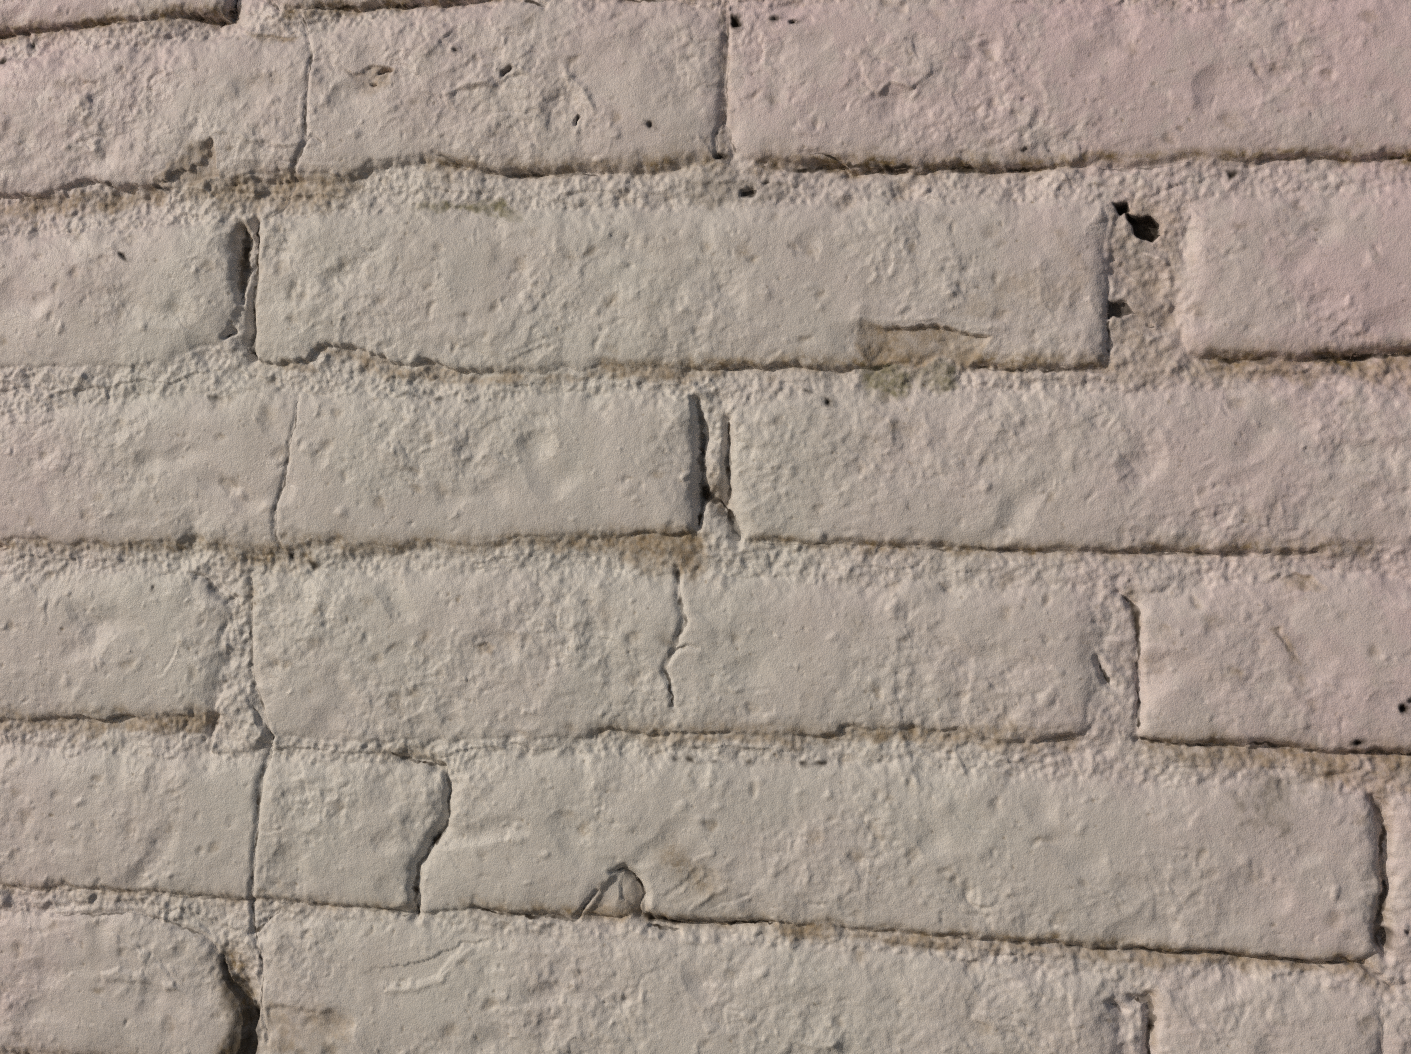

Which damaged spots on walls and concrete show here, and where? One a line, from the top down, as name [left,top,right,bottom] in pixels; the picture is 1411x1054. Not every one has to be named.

spalling [1095,192,1216,394]
crack [661,568,693,705]
crack [1098,592,1141,728]
crack [210,580,280,1039]
crack [389,751,452,917]
spalling [573,847,728,927]
crack [1357,798,1395,1054]
spalling [204,943,360,1054]
crack [1112,995,1157,1054]